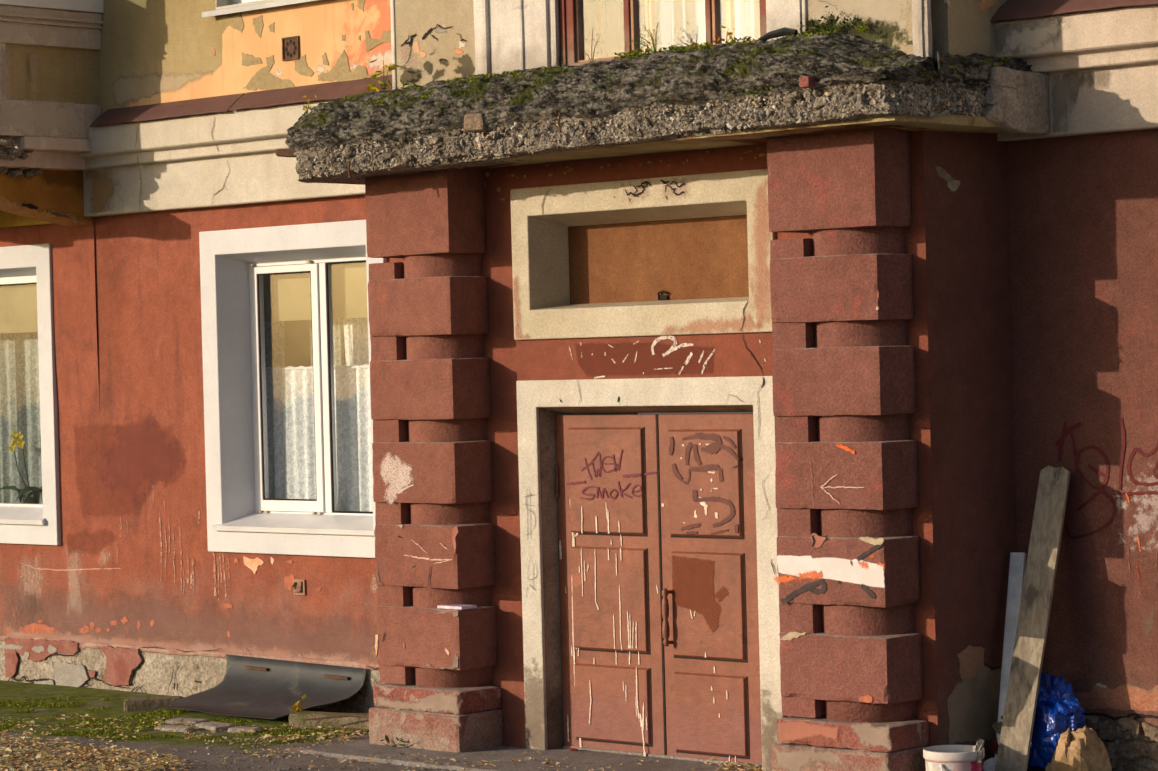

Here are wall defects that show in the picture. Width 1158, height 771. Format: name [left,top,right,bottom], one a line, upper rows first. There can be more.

peeling [113,0,392,107]
peeling [407,39,426,58]
spalling [0,136,49,185]
crack [726,301,764,437]
peeling [4,617,154,687]
peeling [1074,682,1158,712]